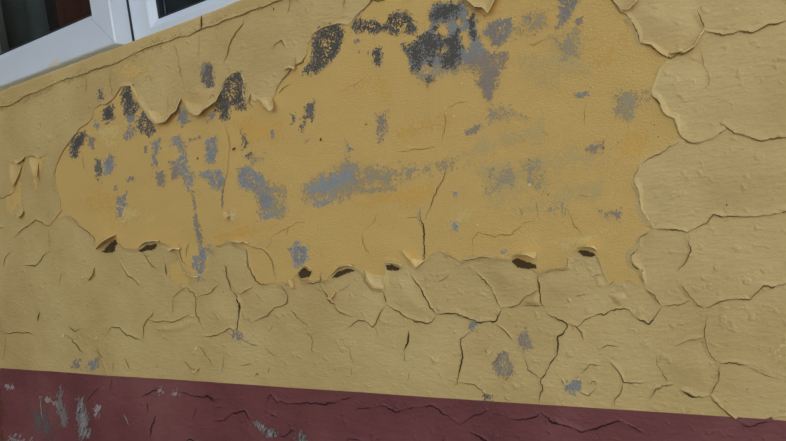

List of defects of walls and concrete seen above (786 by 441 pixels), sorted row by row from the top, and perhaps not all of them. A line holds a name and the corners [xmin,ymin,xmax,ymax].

crack [0,0,290,108]
crack [271,37,309,98]
peeling [6,0,705,293]
crack [719,118,786,141]
crack [1,216,50,267]
peeling [25,384,91,441]
flaking render [253,420,278,439]
flaking render [564,376,582,397]